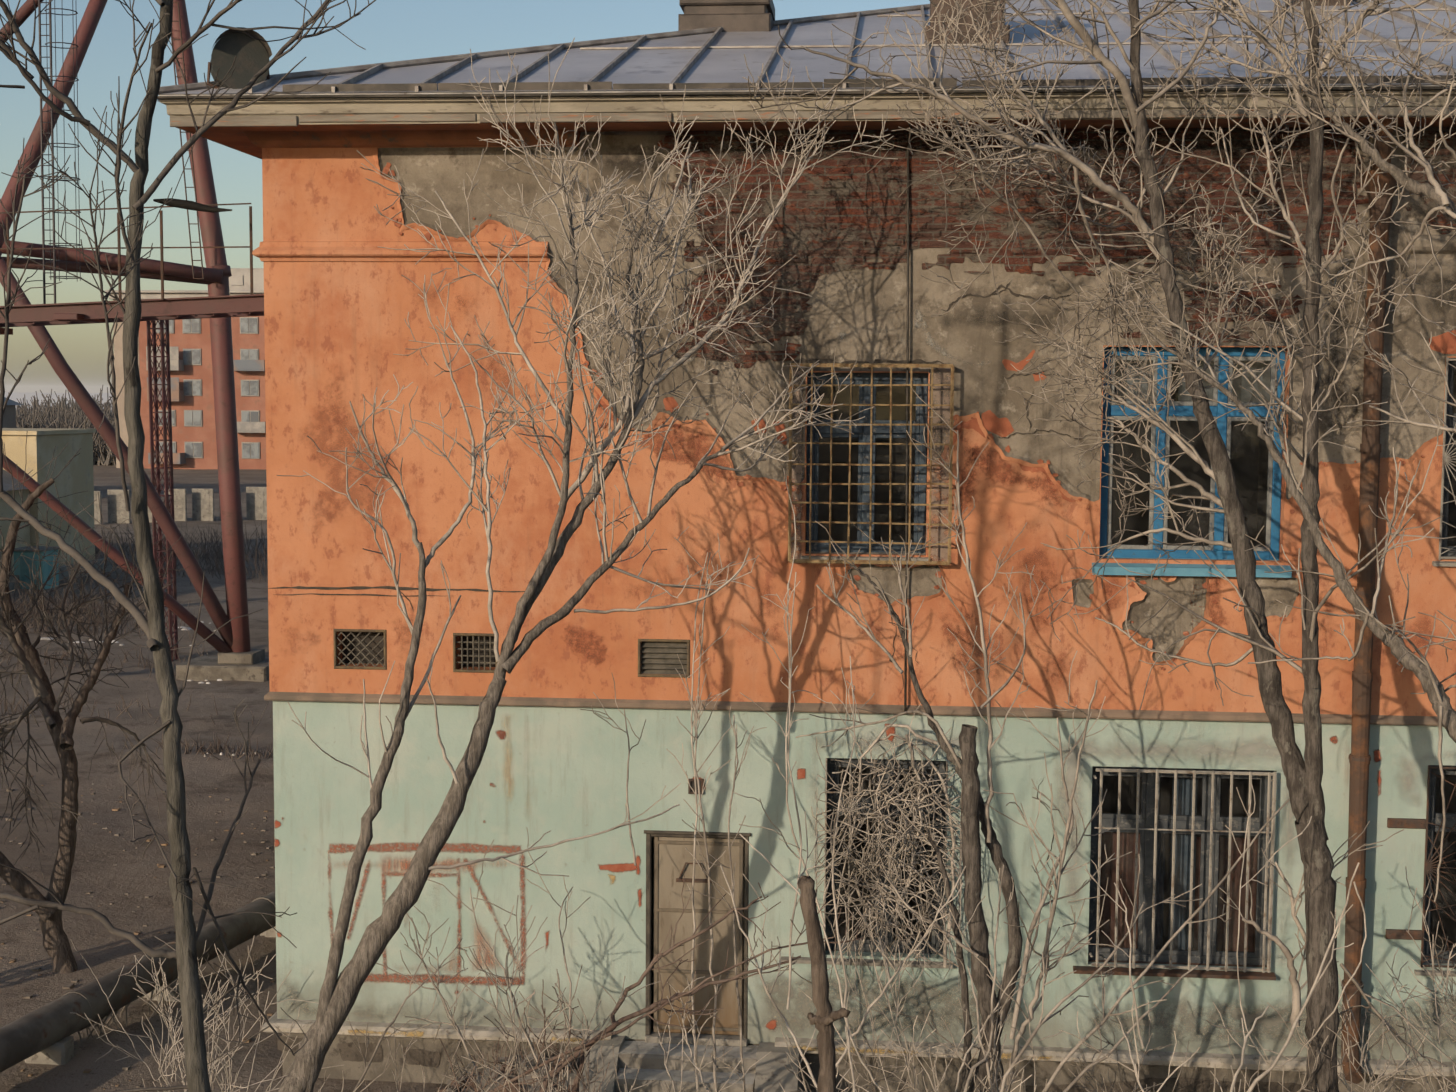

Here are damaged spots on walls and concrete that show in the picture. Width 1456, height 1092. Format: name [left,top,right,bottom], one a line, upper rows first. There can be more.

spalling [373,126,1456,608]
spalling [1059,575,1222,670]
spalling [1255,573,1303,624]